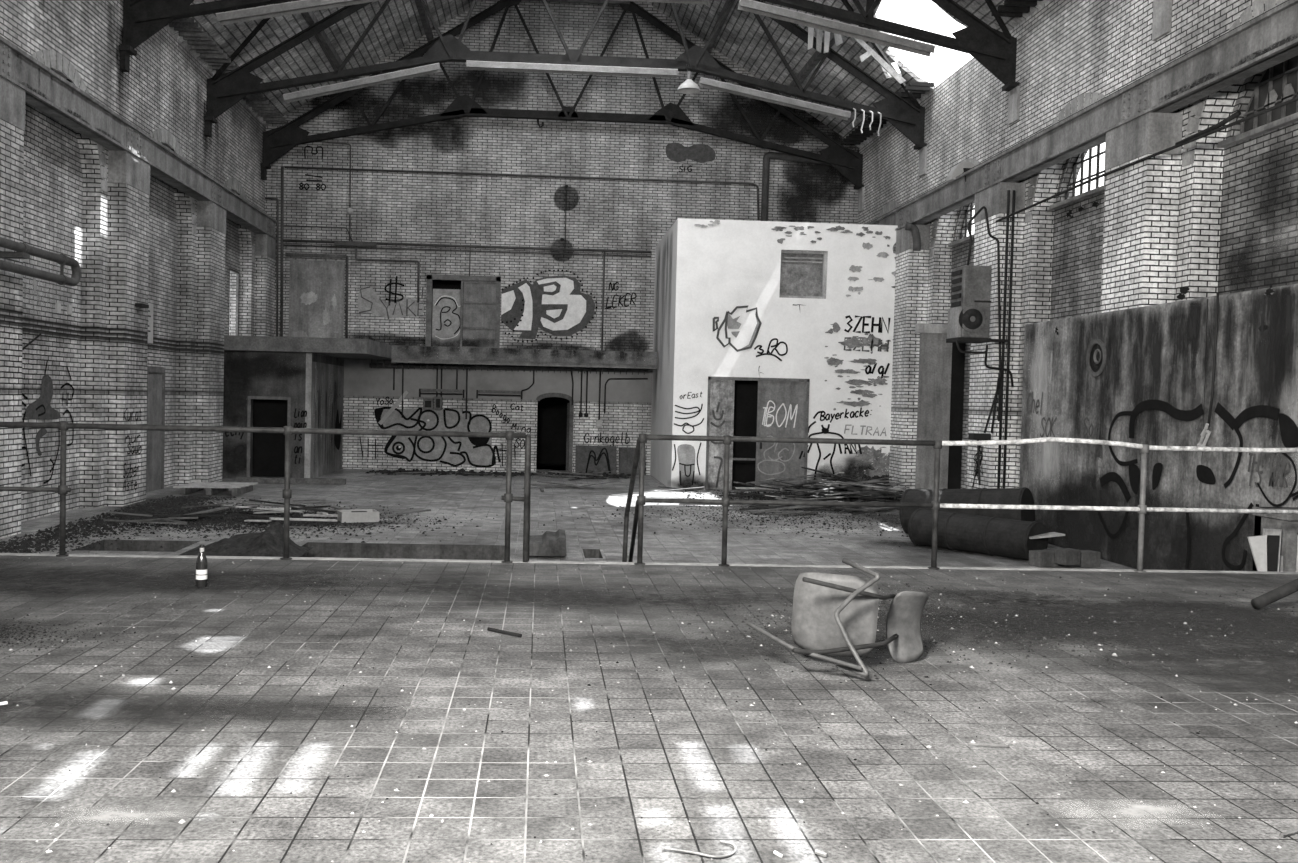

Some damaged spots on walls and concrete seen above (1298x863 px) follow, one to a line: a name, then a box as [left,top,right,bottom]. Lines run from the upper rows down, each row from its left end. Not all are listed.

peeling [772,226,896,297]
peeling [824,322,891,410]
damp [1027,289,1298,571]